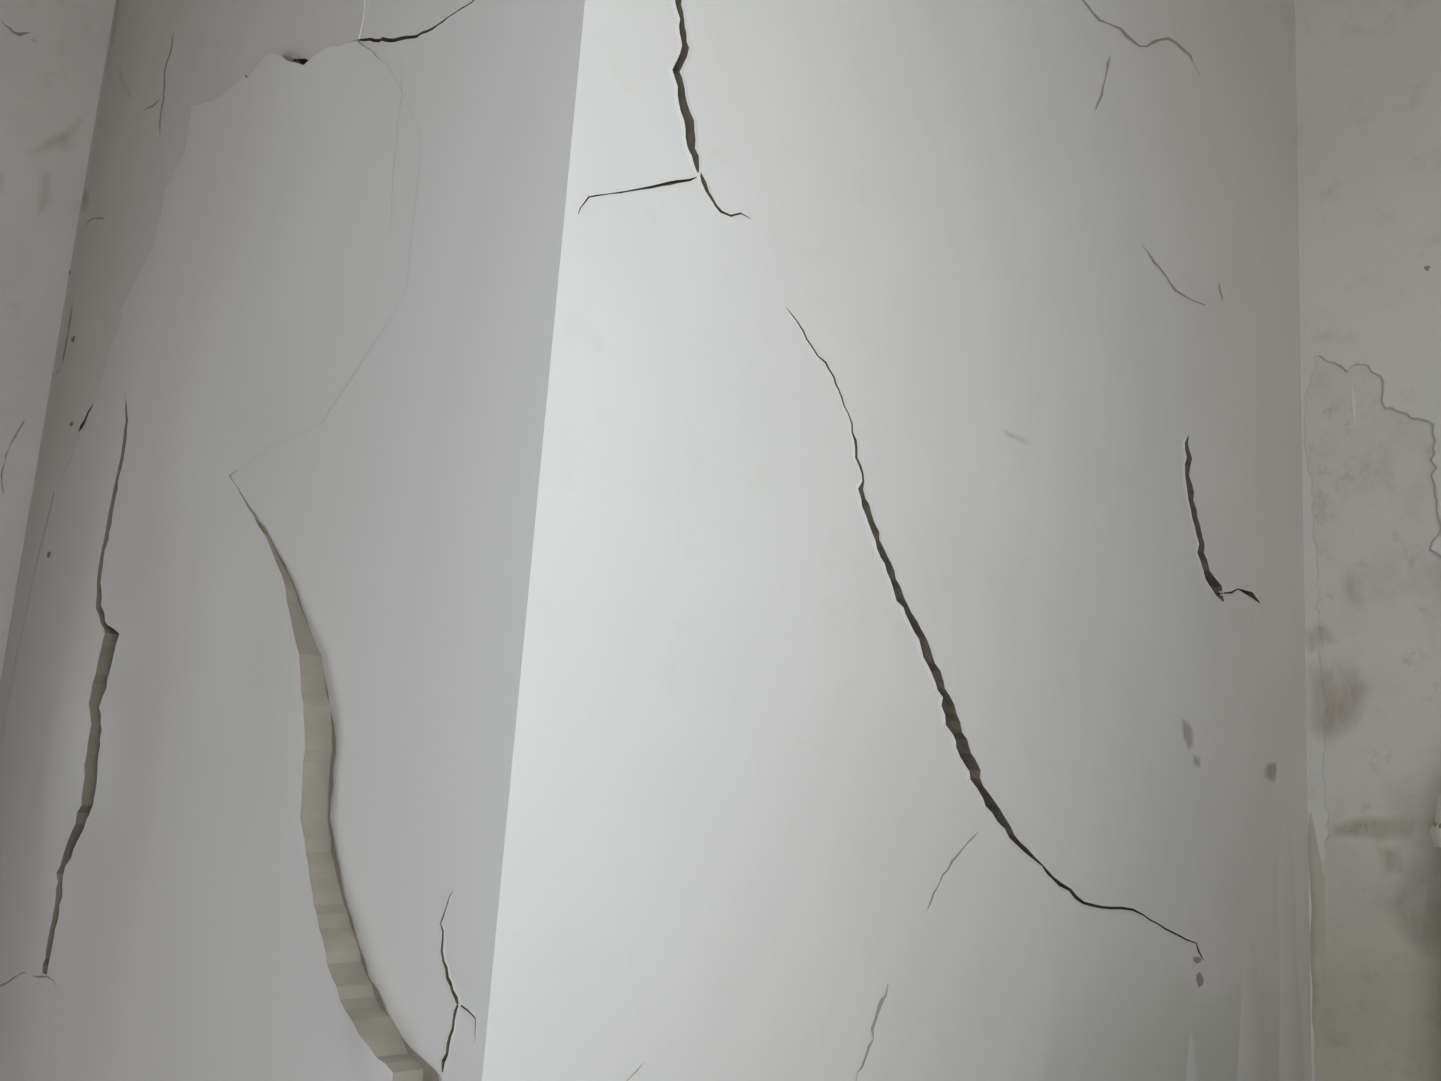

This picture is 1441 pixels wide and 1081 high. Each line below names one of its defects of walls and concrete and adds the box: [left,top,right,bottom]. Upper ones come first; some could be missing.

crack [576,0,751,220]
crack [1082,0,1201,110]
crack [253,512,307,620]
crack [785,306,1204,988]
crack [1182,434,1261,604]
peeling [1301,352,1441,1081]
crack [324,679,478,1081]